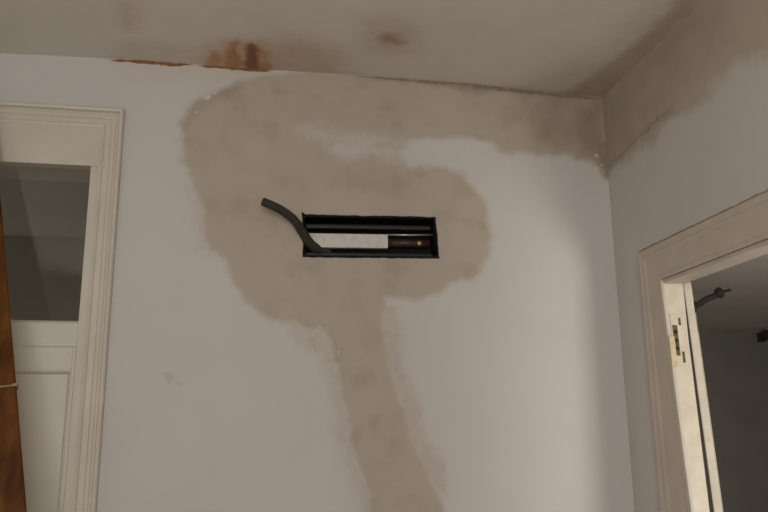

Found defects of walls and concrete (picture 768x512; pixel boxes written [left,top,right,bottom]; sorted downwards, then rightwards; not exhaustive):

rust [99,32,286,87]
damp [172,0,768,512]